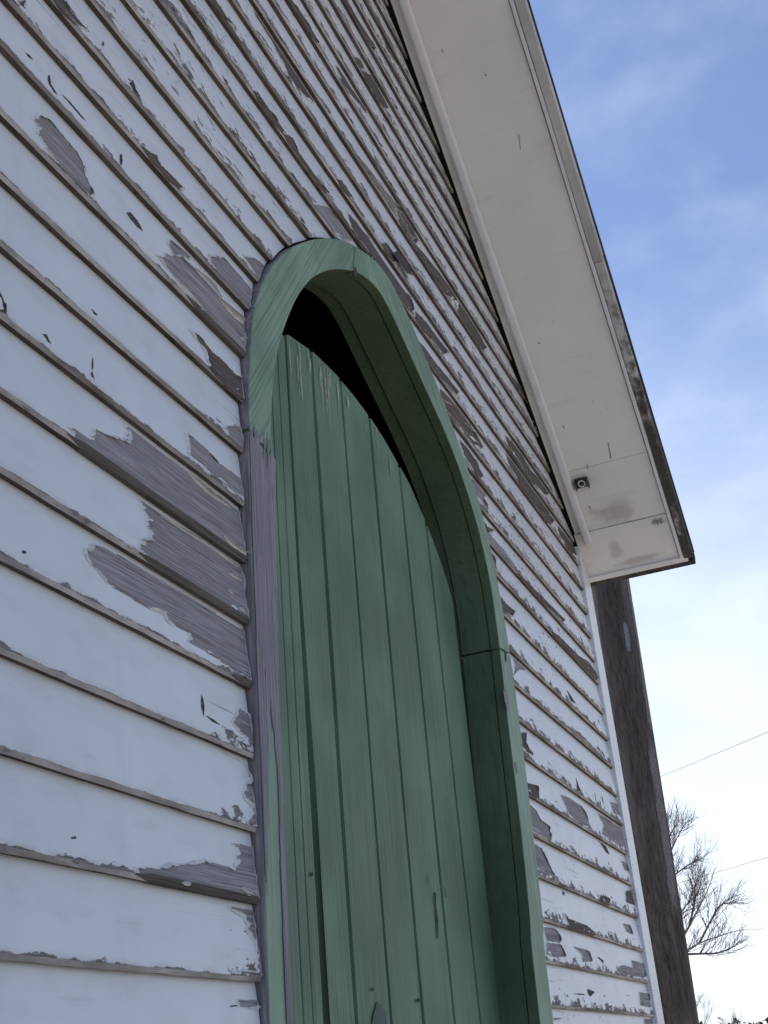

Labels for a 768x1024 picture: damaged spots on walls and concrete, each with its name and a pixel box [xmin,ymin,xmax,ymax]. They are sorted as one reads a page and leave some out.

peeling [211,0,235,29]
peeling [30,112,95,199]
peeling [154,238,247,401]
peeling [207,253,265,307]
peeling [238,0,599,681]
peeling [67,417,292,1024]
peeling [521,732,635,910]
peeling [543,913,653,1024]